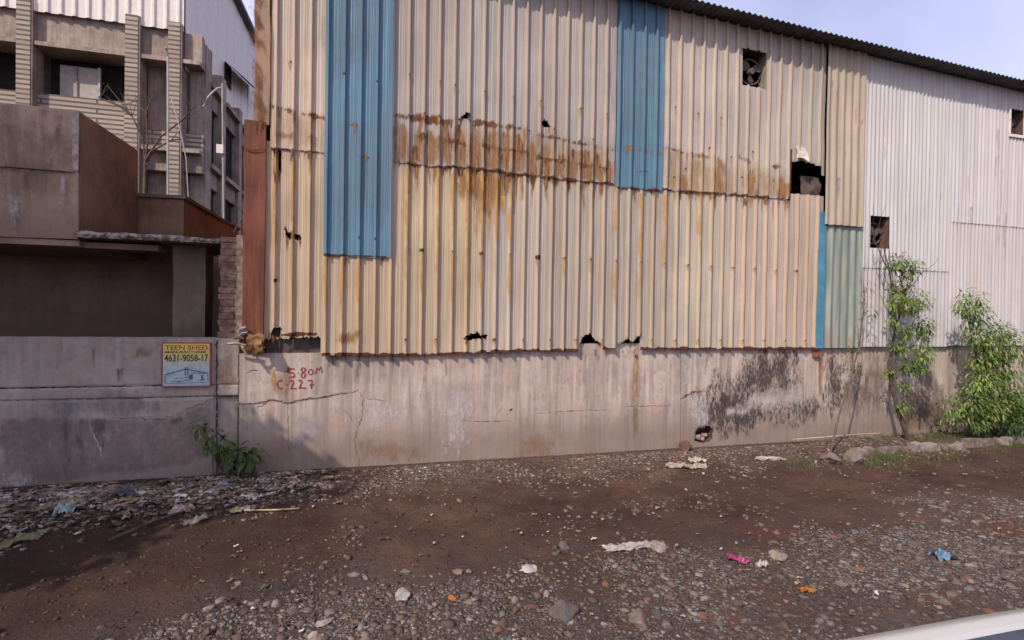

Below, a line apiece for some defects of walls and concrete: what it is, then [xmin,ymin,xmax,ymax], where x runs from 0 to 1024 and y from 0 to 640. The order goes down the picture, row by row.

corrosion [393,112,802,295]
corrosion [269,332,317,345]
crack [236,390,384,465]
spalling [693,425,715,444]
water stain [681,349,884,439]